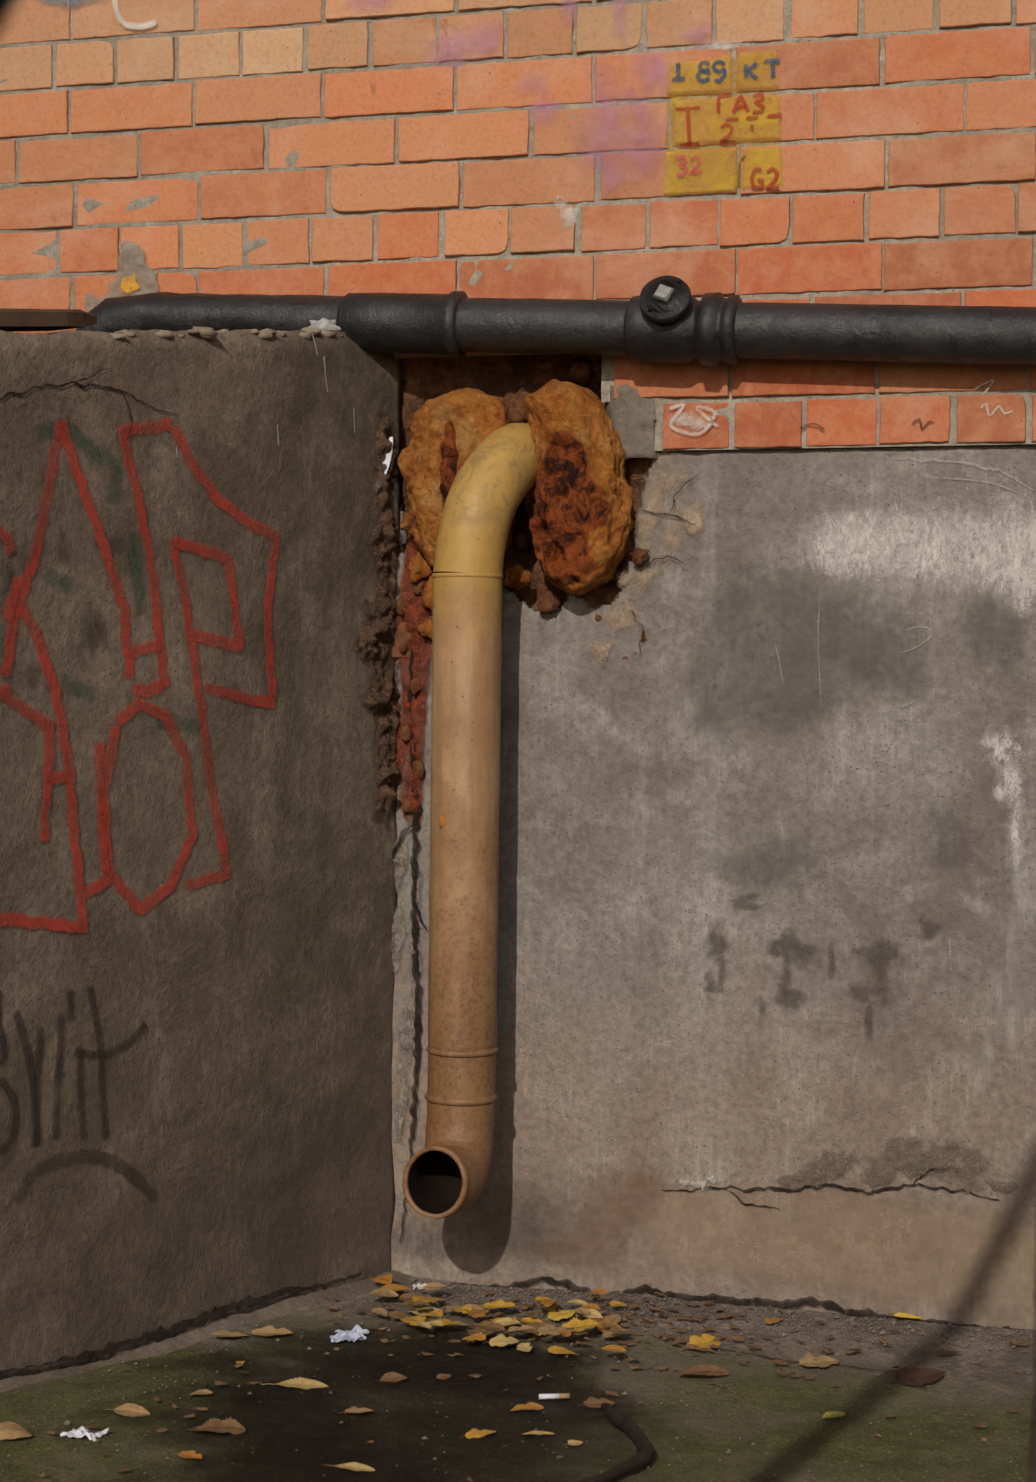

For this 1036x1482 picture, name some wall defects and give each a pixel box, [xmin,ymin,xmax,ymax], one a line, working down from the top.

crack [0,367,177,439]
rust [395,542,432,822]
crack [662,1167,999,1210]